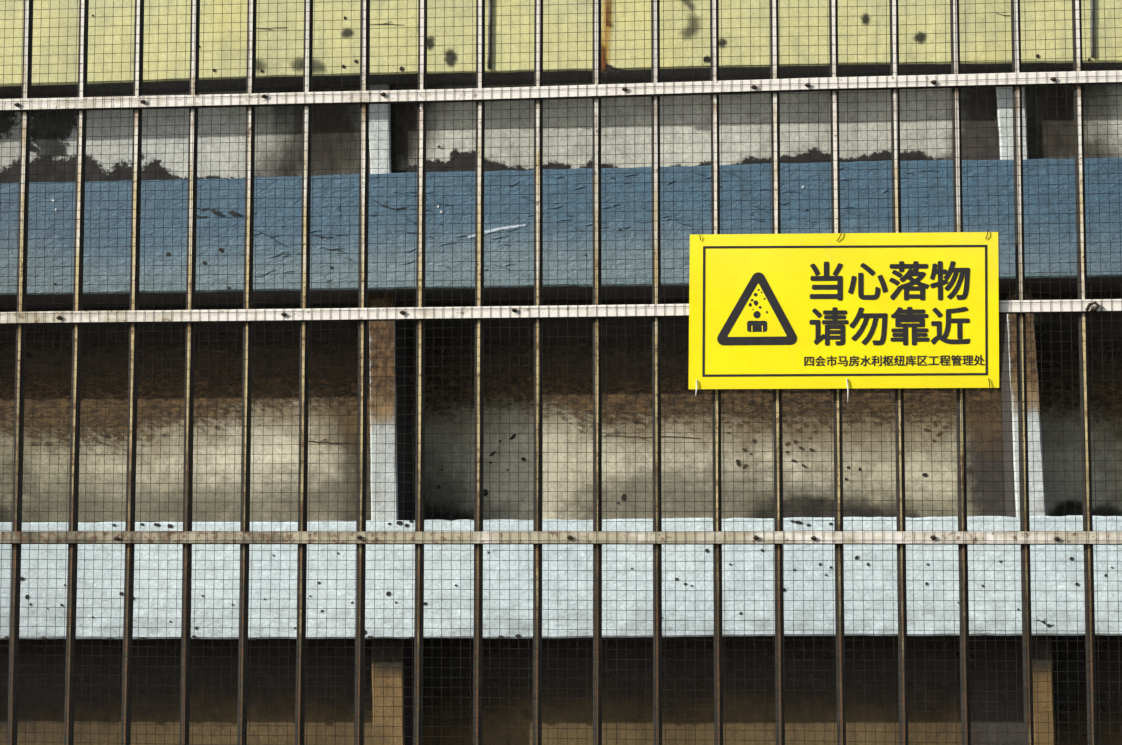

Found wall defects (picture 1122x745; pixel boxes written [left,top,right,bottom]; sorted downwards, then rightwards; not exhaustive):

corrosion [601,0,611,70]
damp [682,1,696,37]
damp [0,97,77,162]
damp [257,87,370,177]
damp [0,290,1122,523]